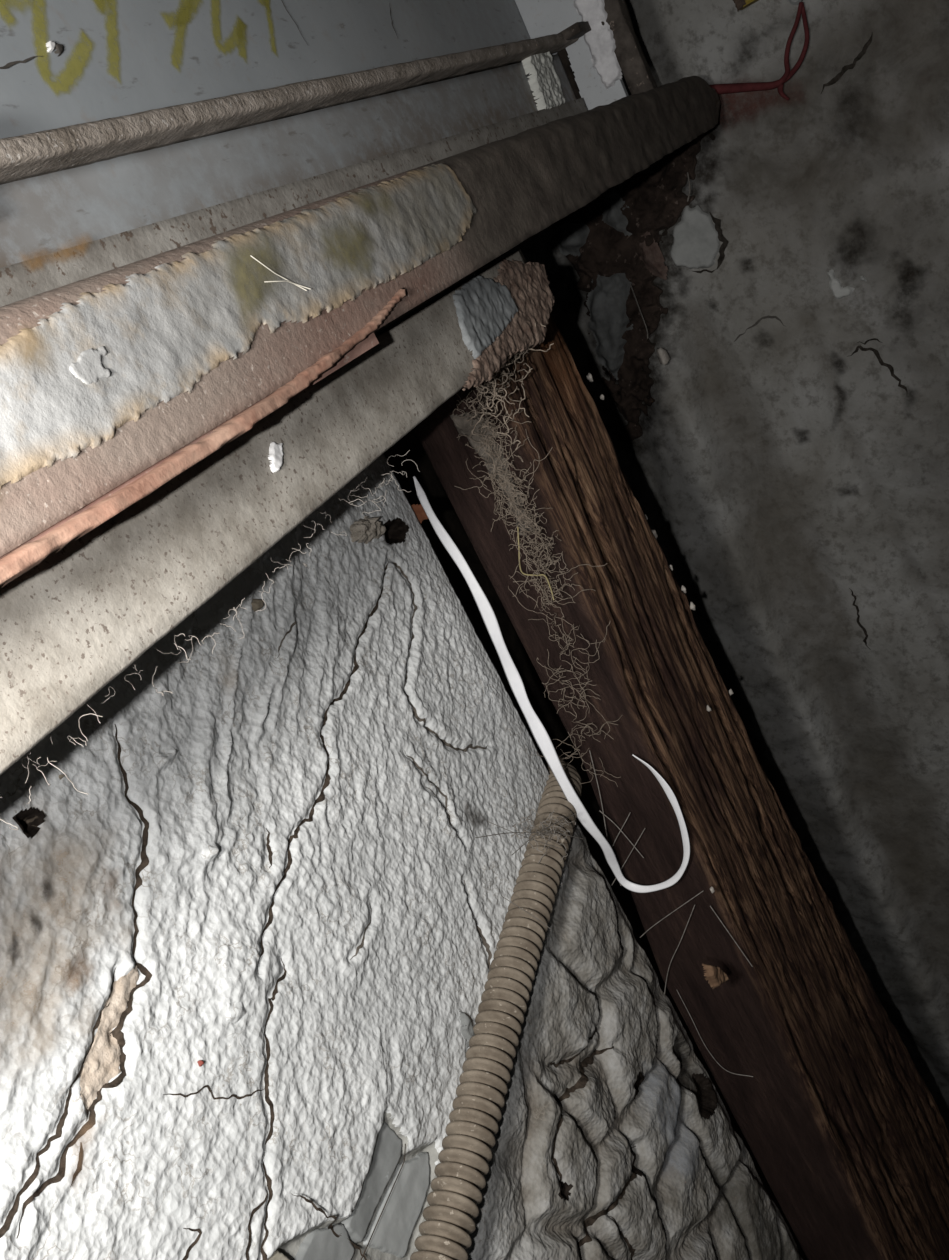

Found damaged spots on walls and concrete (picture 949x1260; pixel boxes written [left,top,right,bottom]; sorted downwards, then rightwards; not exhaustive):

peeling [670,204,728,273]
peeling [0,163,477,489]
crack [847,338,907,392]
spalling [383,517,409,545]
rust [410,504,428,524]
crack [849,588,871,650]
crack [164,559,487,1260]
crack [464,881,492,971]
crack [0,724,152,1239]
spalling [79,966,139,1113]
crack [545,1029,614,1182]